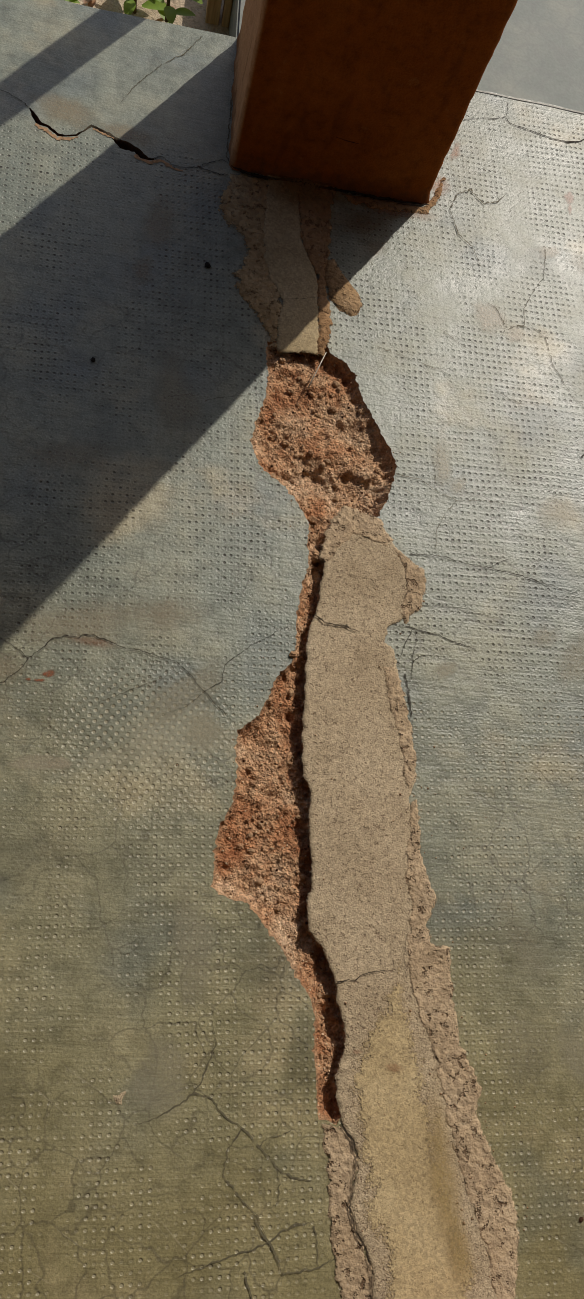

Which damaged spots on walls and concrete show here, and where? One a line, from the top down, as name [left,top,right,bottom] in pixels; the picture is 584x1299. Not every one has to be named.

crack [122,36,202,101]
crack [0,79,507,266]
crack [464,103,584,143]
crack [0,615,357,718]
spalling [210,341,397,1125]
crack [136,1020,374,1299]